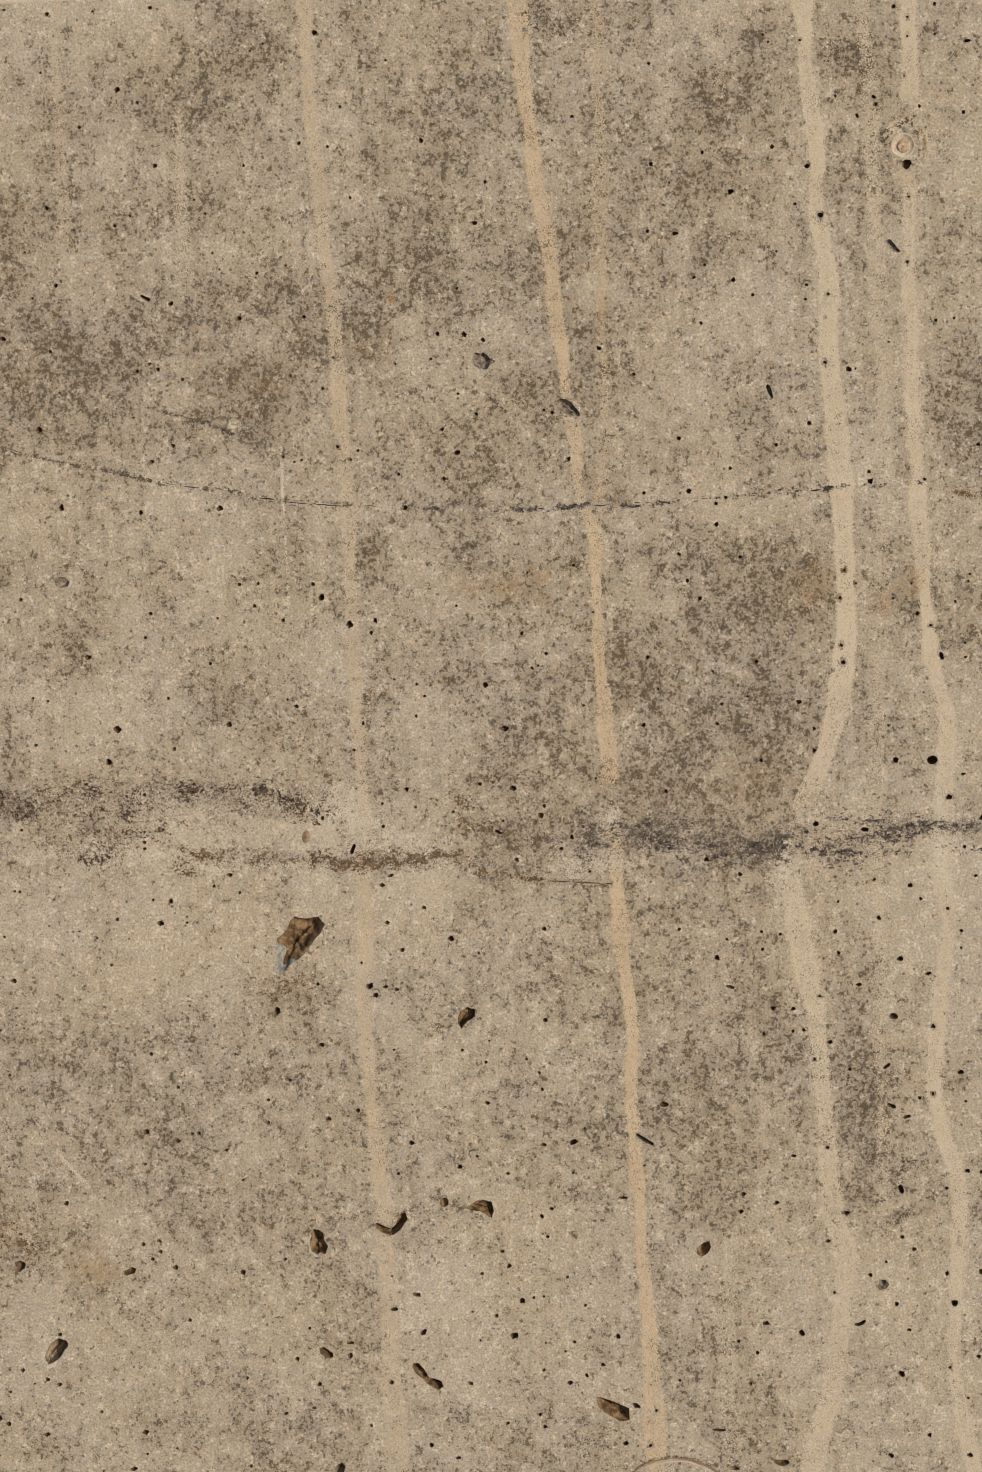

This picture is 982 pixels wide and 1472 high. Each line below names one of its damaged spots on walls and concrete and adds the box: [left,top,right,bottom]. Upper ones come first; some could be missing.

leakage [0,0,548,1227]
leakage [427,0,982,1472]
leakage [374,1231,412,1472]